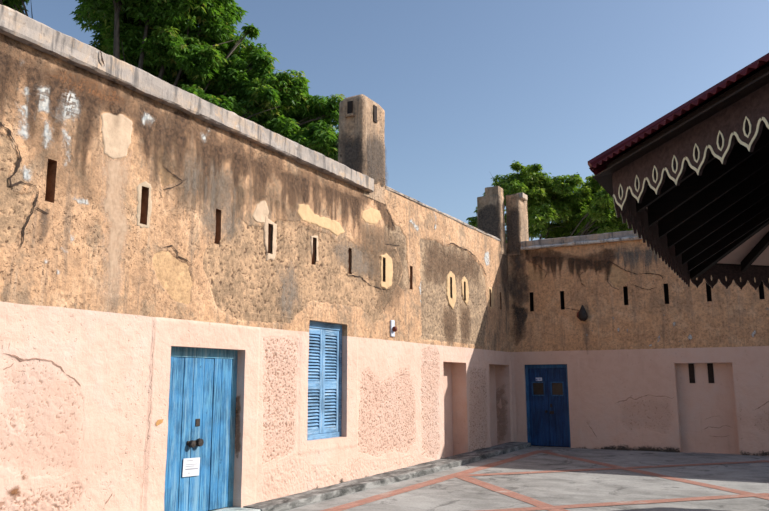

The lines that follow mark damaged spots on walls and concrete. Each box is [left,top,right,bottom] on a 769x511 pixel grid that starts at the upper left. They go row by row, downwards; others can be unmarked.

crack [0,122,48,248]
damp [0,37,403,303]
crack [4,353,81,386]
damp [427,245,475,281]
damp [444,309,469,341]
damp [477,204,652,340]